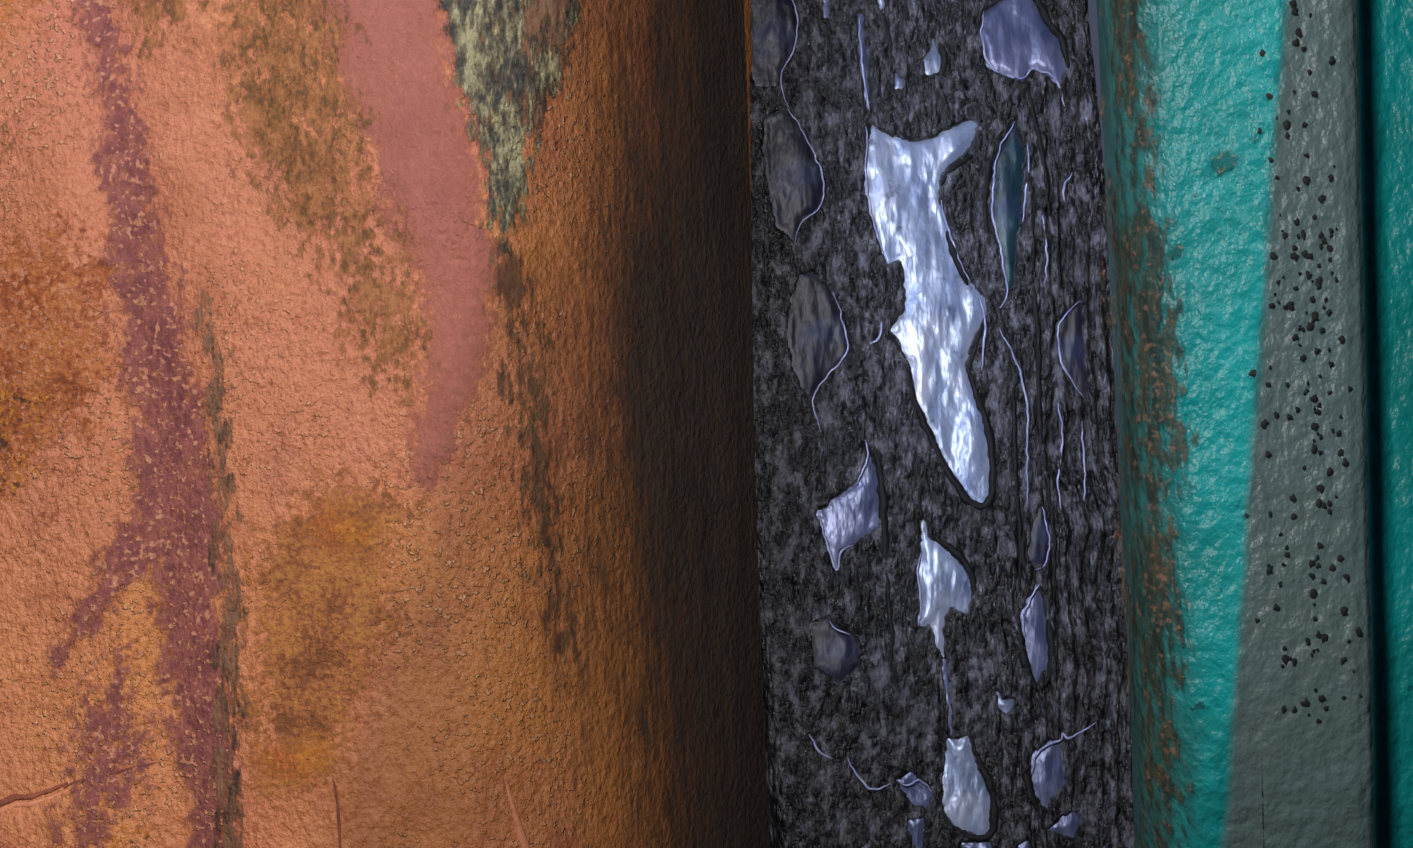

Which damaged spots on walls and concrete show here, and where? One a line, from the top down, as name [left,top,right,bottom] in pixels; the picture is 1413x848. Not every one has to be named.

peeling [751,0,825,244]
peeling [980,0,1070,106]
peeling [857,14,1025,511]
peeling [787,272,850,433]
peeling [1054,299,1087,398]
corrosion [1099,0,1198,848]
peeling [816,440,889,571]
peeling [1018,507,1056,691]
crack [0,762,156,813]
peeling [896,519,1000,848]
peeling [996,691,1013,713]
peeling [1022,722,1096,838]